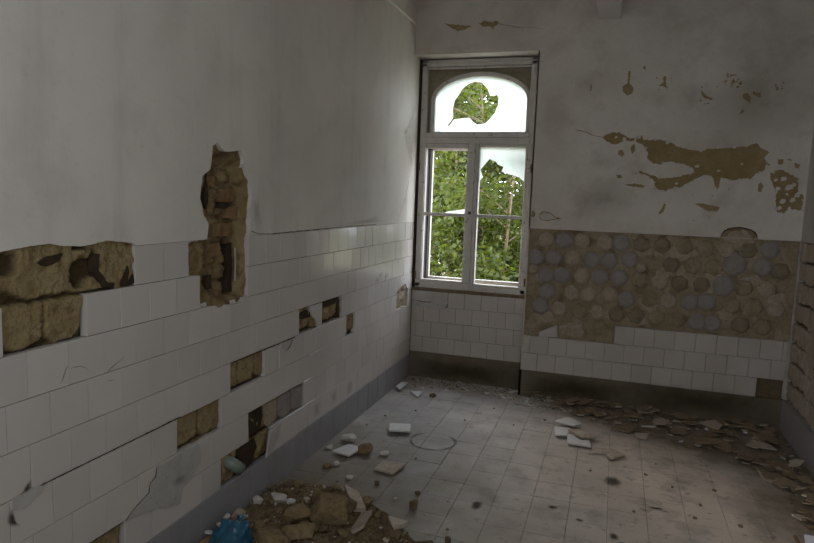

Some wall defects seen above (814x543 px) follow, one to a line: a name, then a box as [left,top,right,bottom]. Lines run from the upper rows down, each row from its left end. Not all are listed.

peeling [445,20,499,32]
peeling [622,71,634,95]
peeling [575,129,804,213]
flaking render [188,144,248,308]
peeling [0,241,134,354]
peeling [298,297,353,334]
peeling [524,210,814,431]
peeling [230,350,262,390]
peeling [177,399,218,449]
peeling [221,383,302,484]